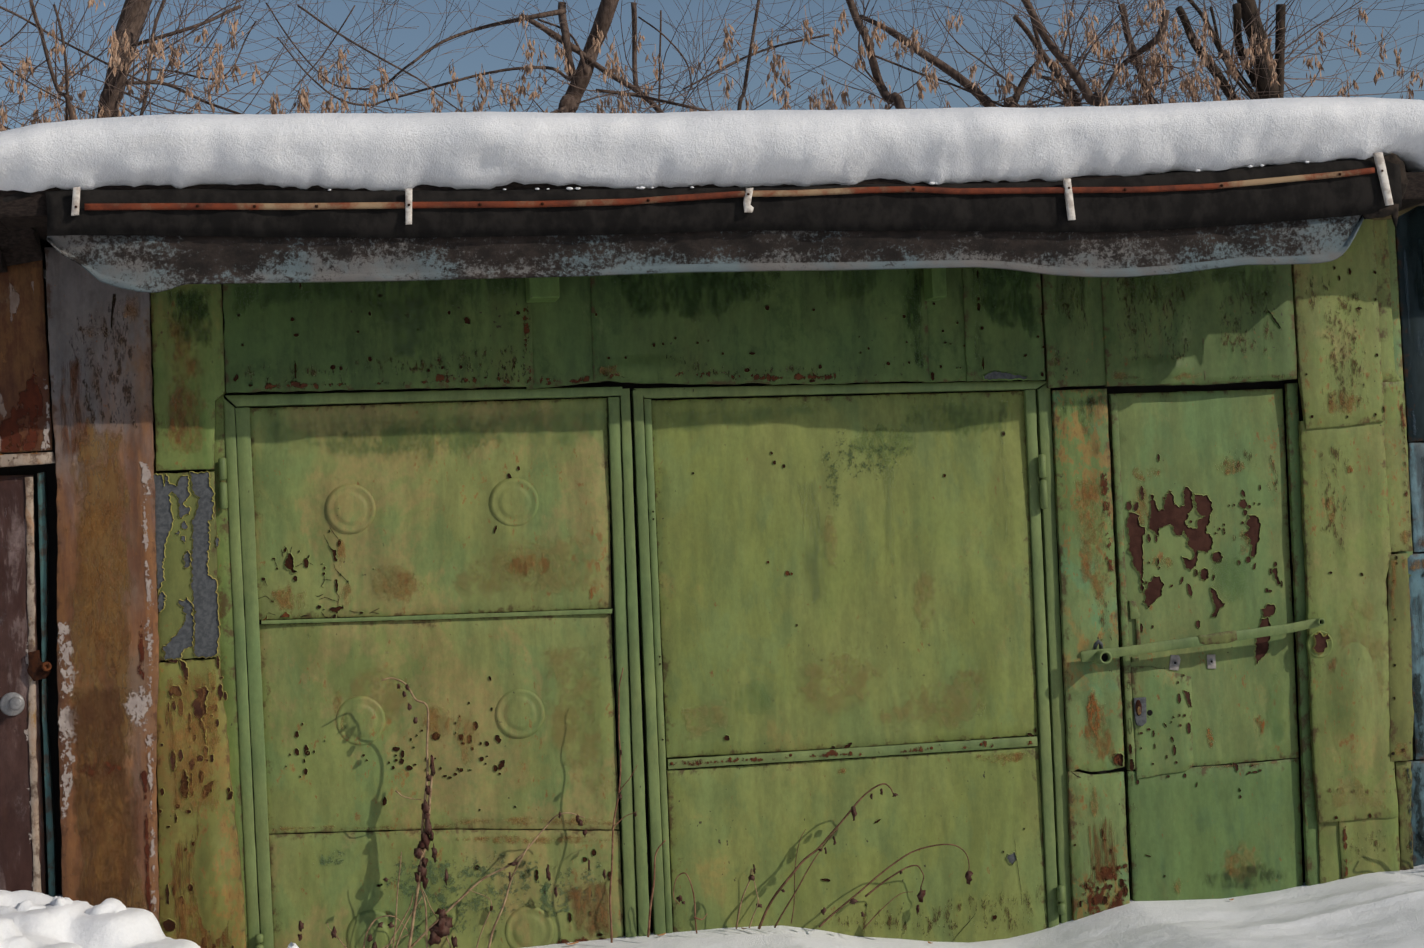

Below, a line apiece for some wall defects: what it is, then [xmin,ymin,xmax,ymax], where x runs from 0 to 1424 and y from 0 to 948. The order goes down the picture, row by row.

rust [0,368,43,455]
rust [1306,277,1366,412]
rust [60,303,152,912]
rust [1078,473,1114,641]
peeling [123,462,234,932]
rust [1082,792,1136,915]